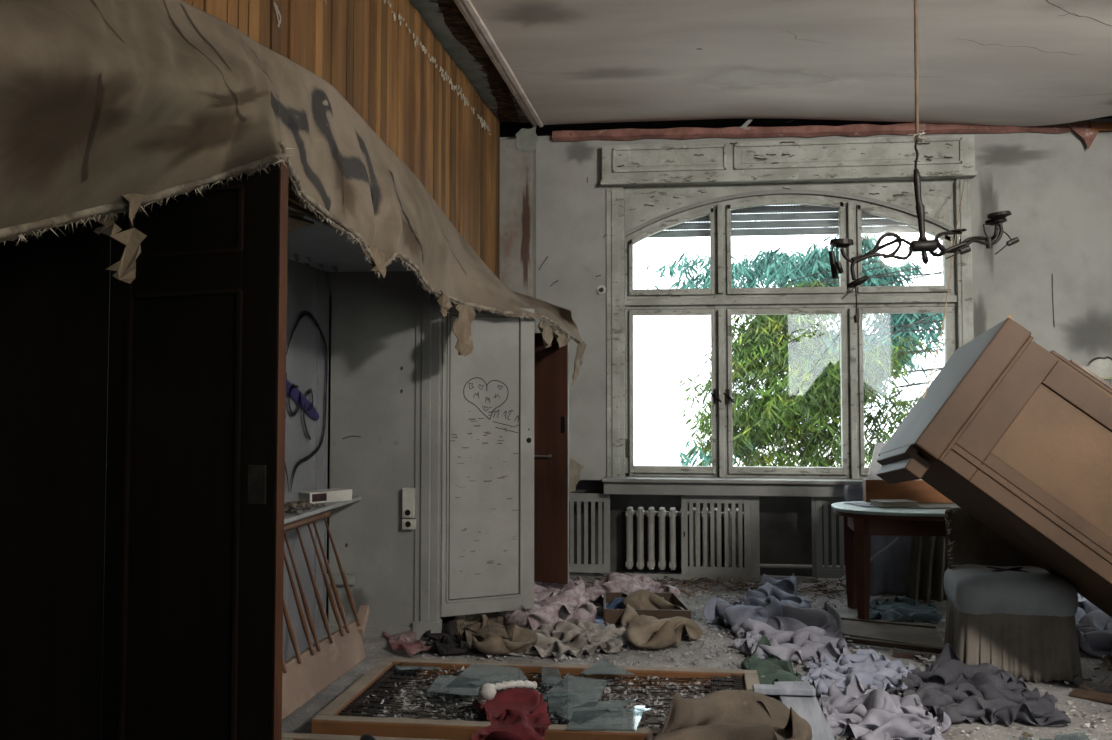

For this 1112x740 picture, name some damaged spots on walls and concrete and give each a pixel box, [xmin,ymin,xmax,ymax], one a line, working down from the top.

flaking render [1084,356,1112,380]